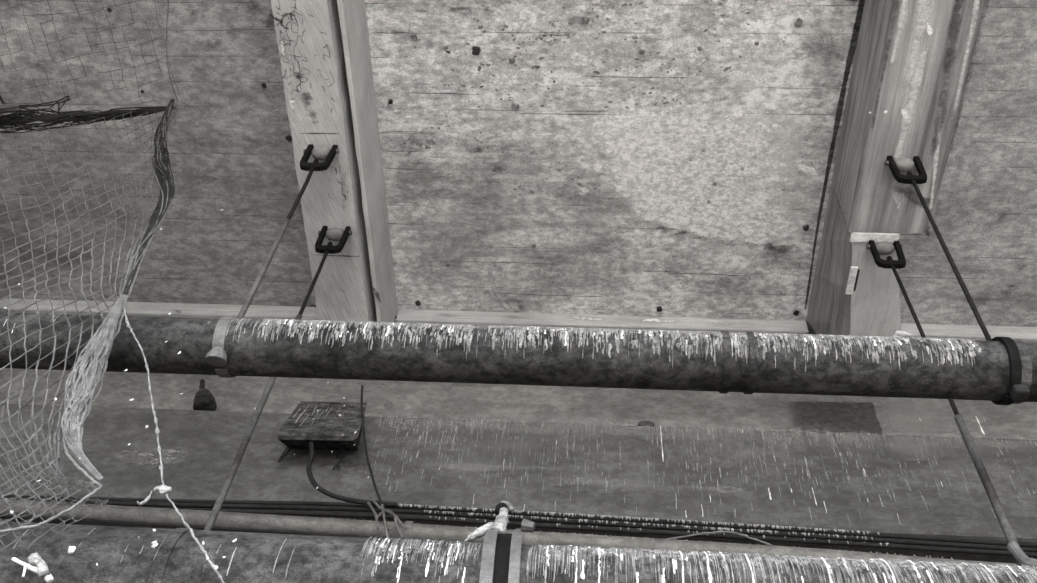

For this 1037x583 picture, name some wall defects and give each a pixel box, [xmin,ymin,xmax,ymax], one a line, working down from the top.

water stain [226,317,981,372]
water stain [365,402,637,514]
water stain [645,401,969,526]
water stain [976,416,1037,500]
water stain [360,537,482,583]
water stain [526,544,1037,583]